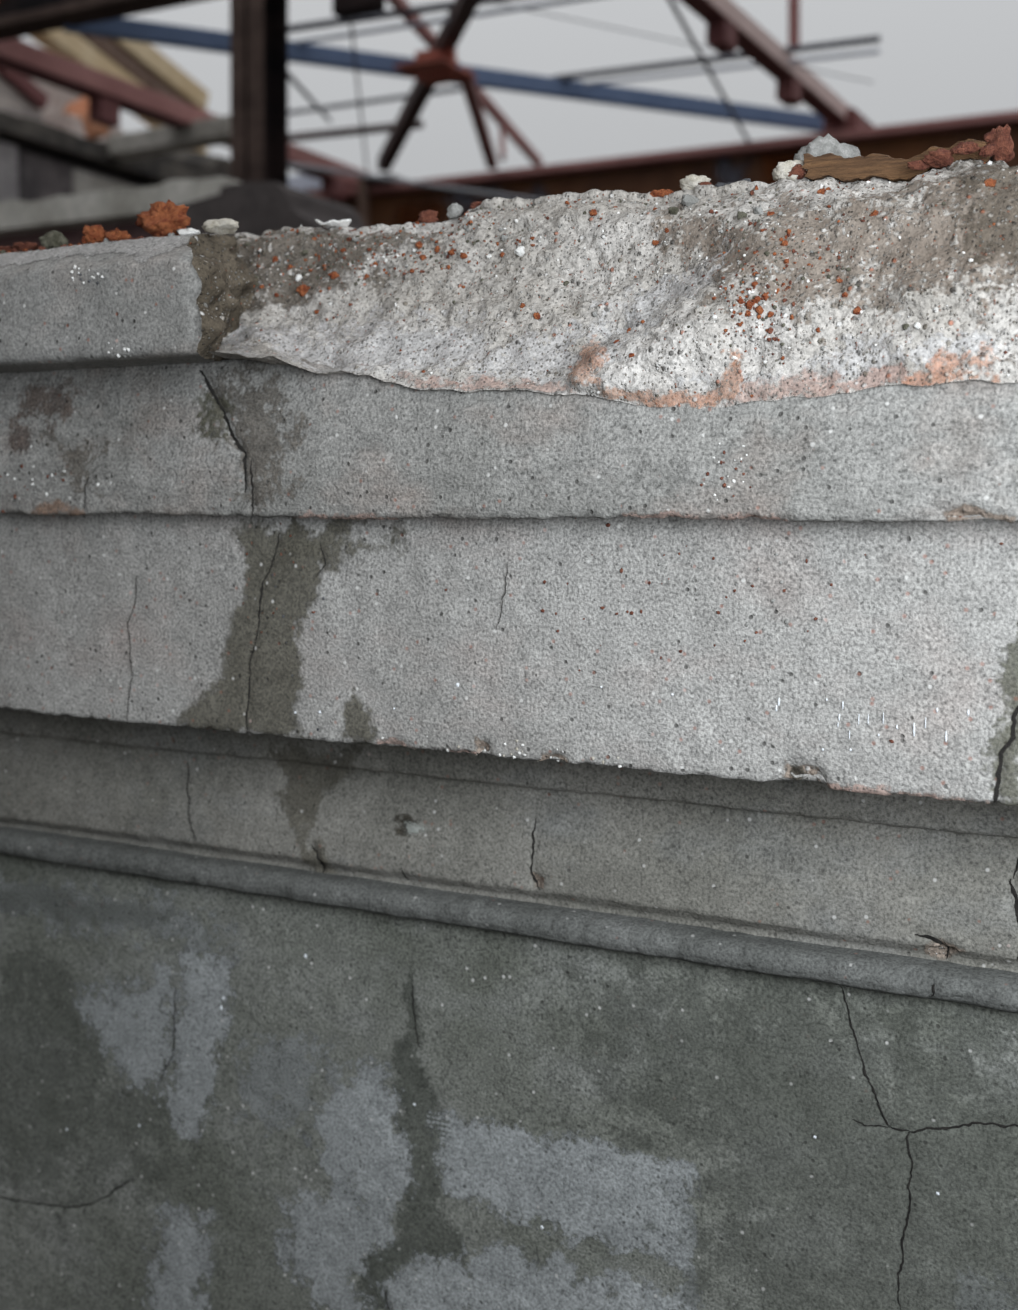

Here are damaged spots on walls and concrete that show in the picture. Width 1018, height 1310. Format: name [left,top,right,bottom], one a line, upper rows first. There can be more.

spalling [187,159,1018,409]
crack [199,370,280,732]
damp [177,517,378,872]
crack [993,706,1018,802]
crack [1010,860,1018,922]
crack [0,1178,134,1208]
damp [0,878,704,1310]
crack [840,986,1018,1308]